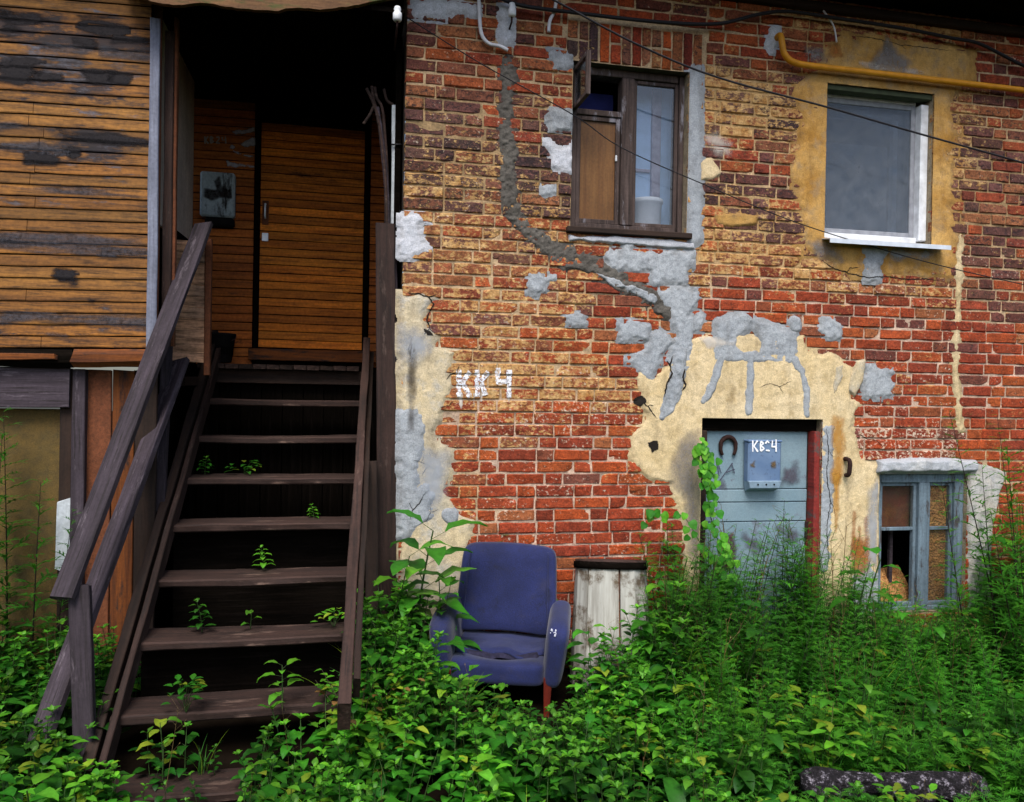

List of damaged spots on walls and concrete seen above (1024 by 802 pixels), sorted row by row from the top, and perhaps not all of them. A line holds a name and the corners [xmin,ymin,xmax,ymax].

crack [496,54,671,321]
flaking render [701,157,722,182]
flaking render [713,211,758,228]
crack [644,356,686,417]
rust [831,421,843,511]